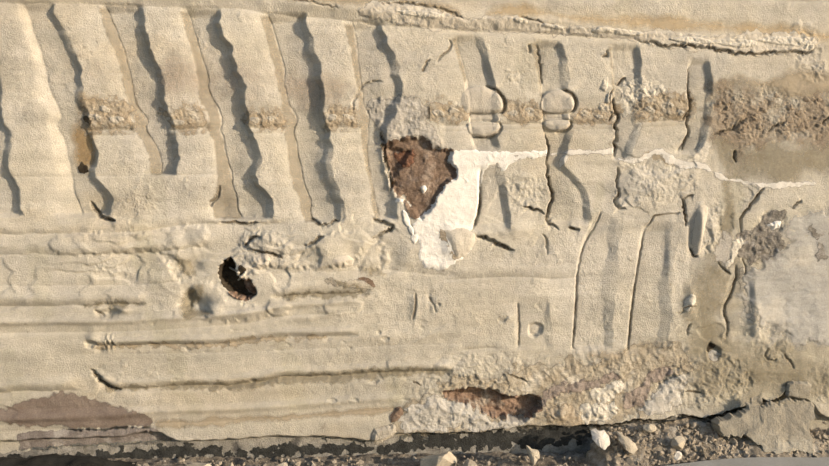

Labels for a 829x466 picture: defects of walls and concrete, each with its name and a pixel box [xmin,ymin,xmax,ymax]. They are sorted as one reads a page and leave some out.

spalling [324,94,470,244]
crack [526,90,588,253]
crack [609,78,624,151]
spalling [573,75,696,126]
spalling [703,80,829,152]
crack [723,260,746,326]
spalling [713,210,787,322]
spalling [372,341,694,450]